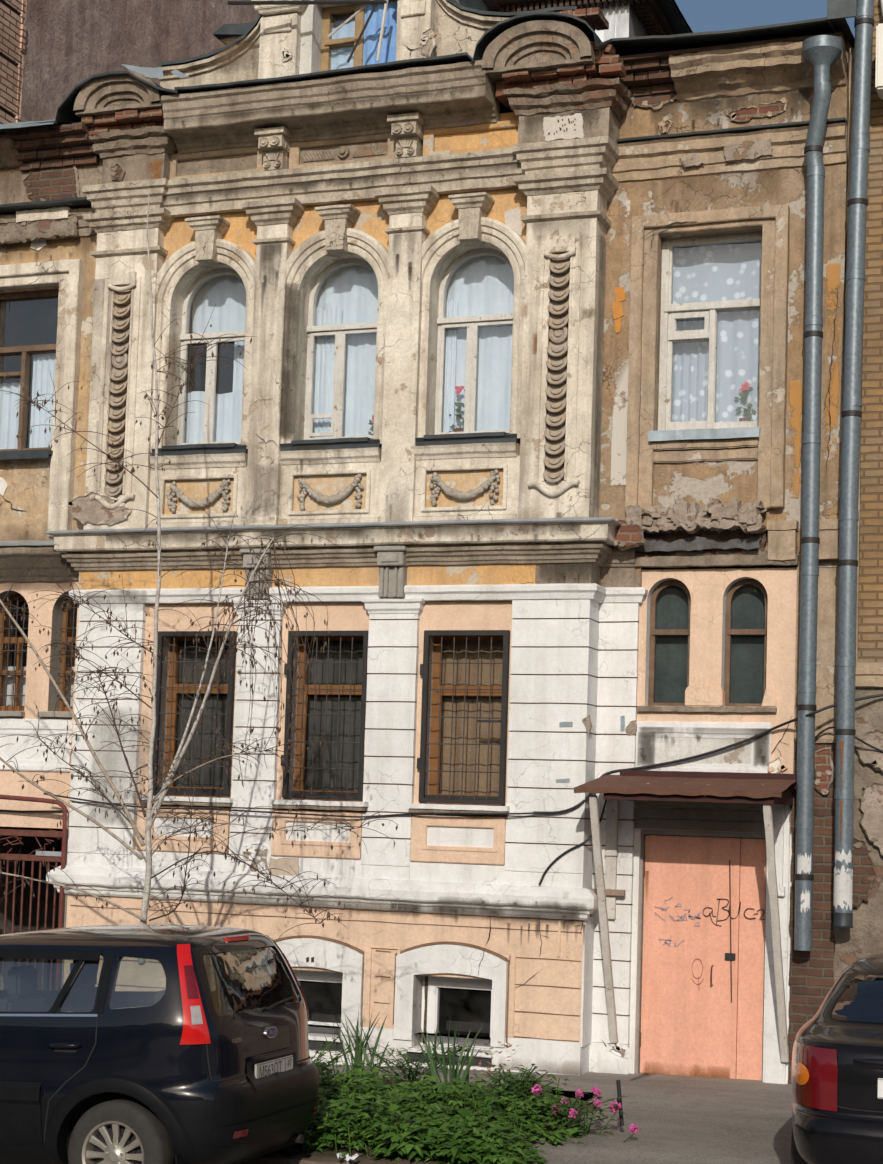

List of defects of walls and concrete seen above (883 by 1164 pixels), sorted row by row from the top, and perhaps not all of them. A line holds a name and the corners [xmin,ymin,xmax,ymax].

flaking render [726,97,789,122]
flaking render [23,165,80,216]
peeling [612,287,626,334]
peeling [827,263,840,312]
peeling [610,360,629,486]
peeling [789,380,802,498]
peeling [826,357,839,448]
peeling [0,477,8,496]
flaking render [814,747,835,796]
flaking render [853,728,883,908]